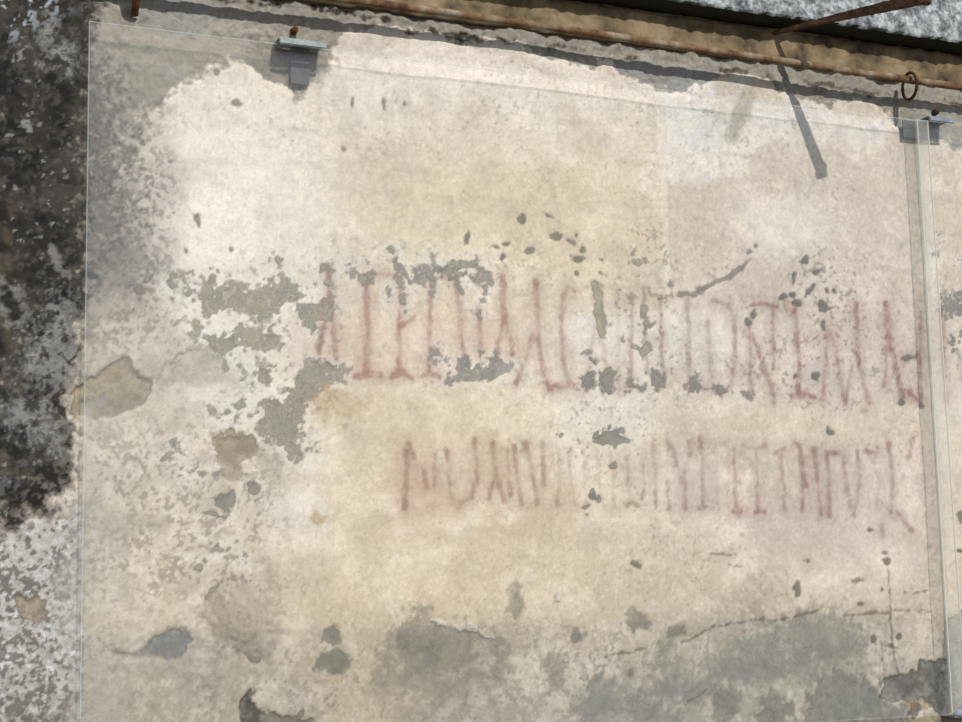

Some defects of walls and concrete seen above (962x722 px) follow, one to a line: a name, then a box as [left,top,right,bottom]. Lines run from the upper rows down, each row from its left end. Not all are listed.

water stain [0,0,137,532]
peeling [167,256,376,386]
peeling [385,245,494,319]
peeling [939,290,962,320]
flaking render [72,357,152,418]
peeling [180,358,353,475]
peeling [430,348,514,386]
peeling [194,540,248,571]
flaking render [145,628,192,659]
crack [682,609,819,642]
crack [851,590,898,669]
flaking render [239,689,313,722]